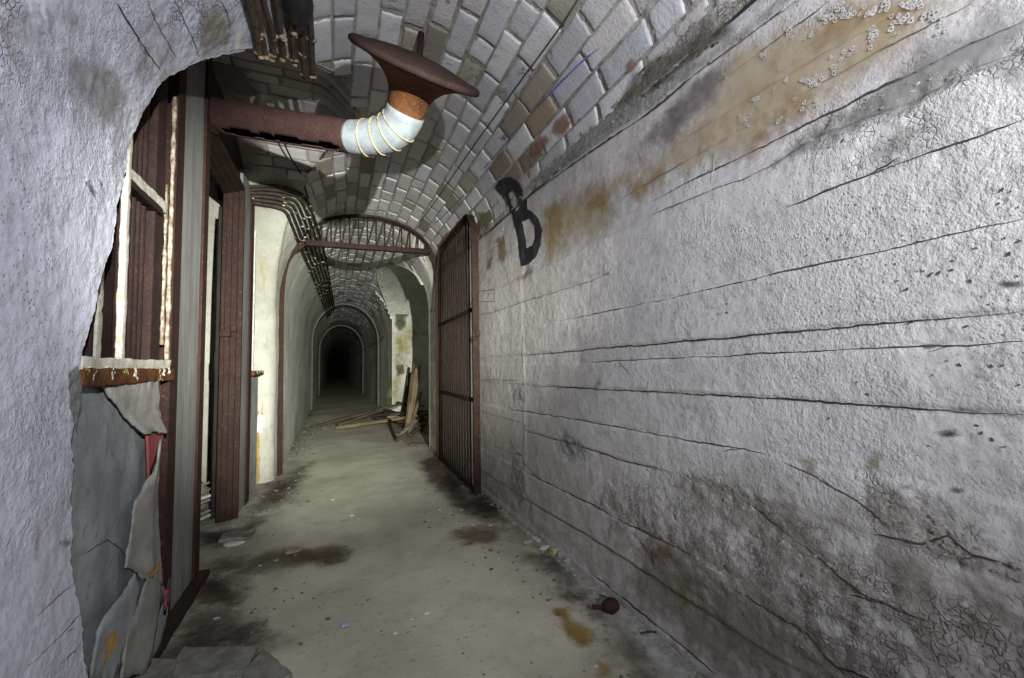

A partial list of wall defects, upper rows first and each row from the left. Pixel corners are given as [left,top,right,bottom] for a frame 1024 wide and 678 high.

leakage [649,7,908,172]
leakage [543,187,616,260]
crack [479,1,1024,597]
spalling [69,366,110,429]
leakage [547,558,704,678]
leakage [645,549,781,658]